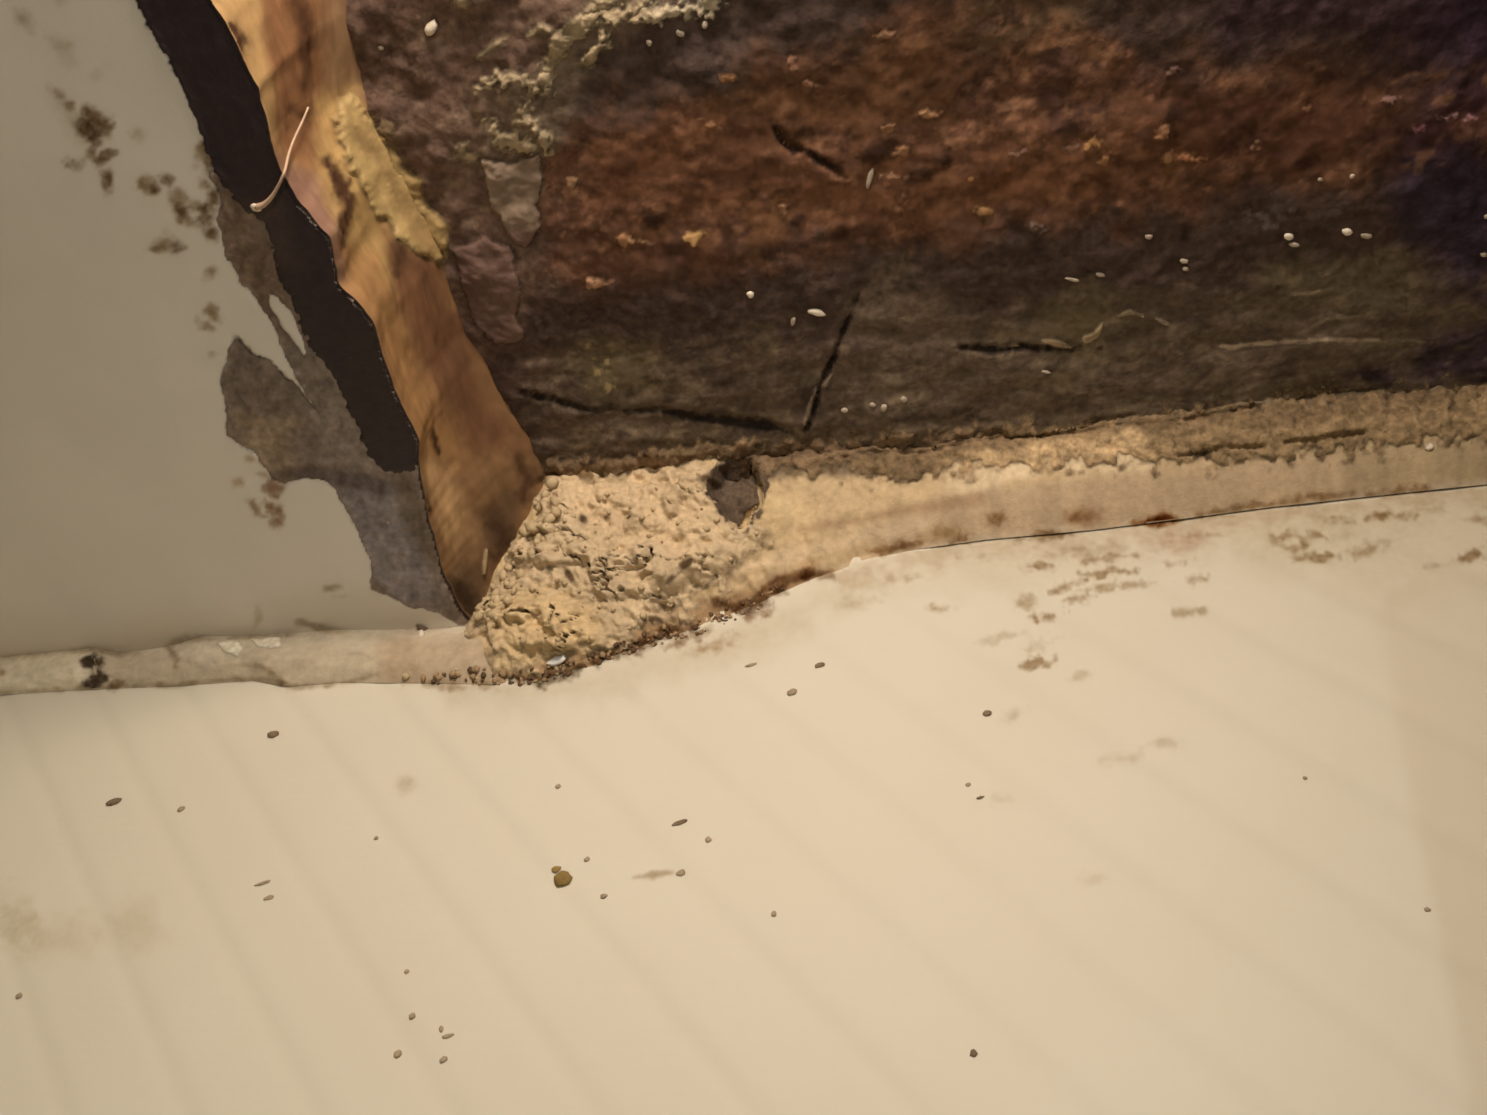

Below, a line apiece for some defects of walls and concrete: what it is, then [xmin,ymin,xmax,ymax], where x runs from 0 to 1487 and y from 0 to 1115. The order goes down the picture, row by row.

leakage [473,0,729,161]
leakage [78,108,113,187]
leakage [176,193,217,238]
leakage [324,157,355,243]
crack [521,390,588,410]
crack [624,293,860,433]
spalling [135,0,1487,676]
leakage [1219,266,1388,350]
leakage [449,580,477,616]